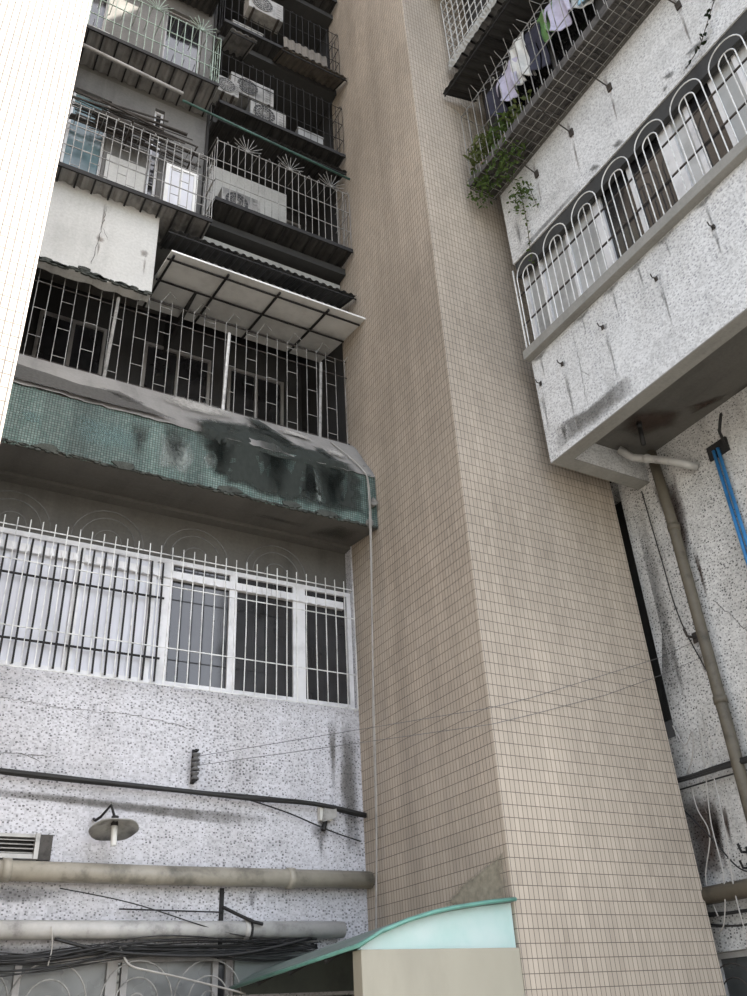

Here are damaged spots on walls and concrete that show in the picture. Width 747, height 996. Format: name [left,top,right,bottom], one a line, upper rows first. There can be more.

damp [562,393,613,436]
damp [304,472,339,505]
damp [687,803,730,872]